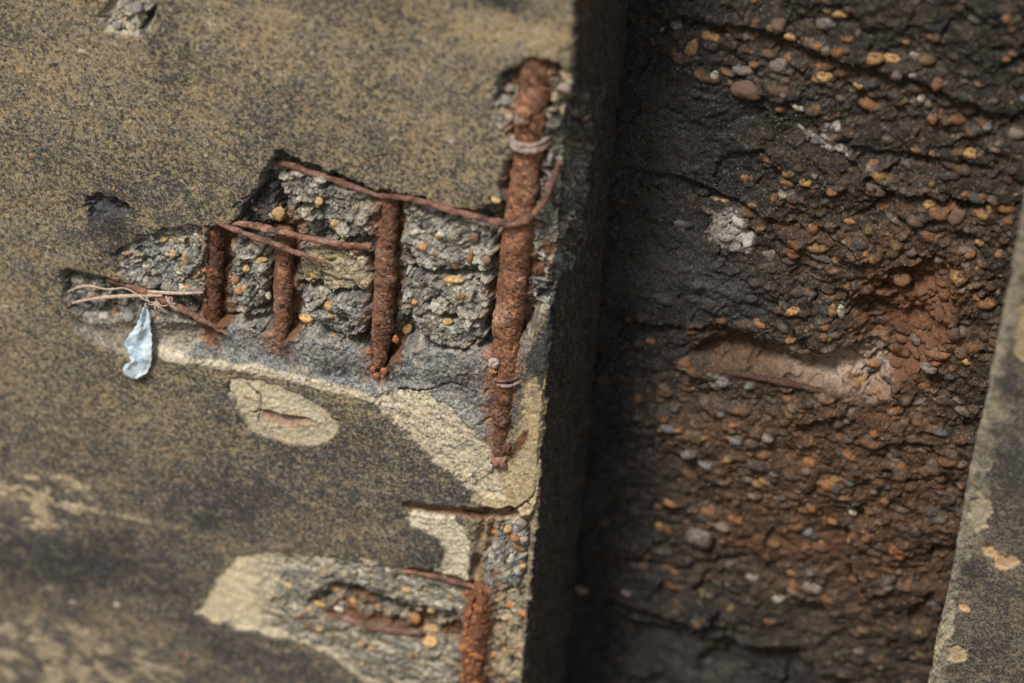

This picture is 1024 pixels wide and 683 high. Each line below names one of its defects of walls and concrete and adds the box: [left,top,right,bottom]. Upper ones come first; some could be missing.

spalling [99,0,160,37]
corrosion [513,106,532,126]
damp [598,65,784,338]
corrosion [531,237,556,277]
corrosion [203,303,239,357]
corrosion [284,313,306,353]
spalling [58,55,596,683]
corrosion [365,333,407,380]
corrosion [460,350,500,385]
spalling [681,253,971,404]
corrosion [863,264,962,401]
corrosion [489,430,529,469]